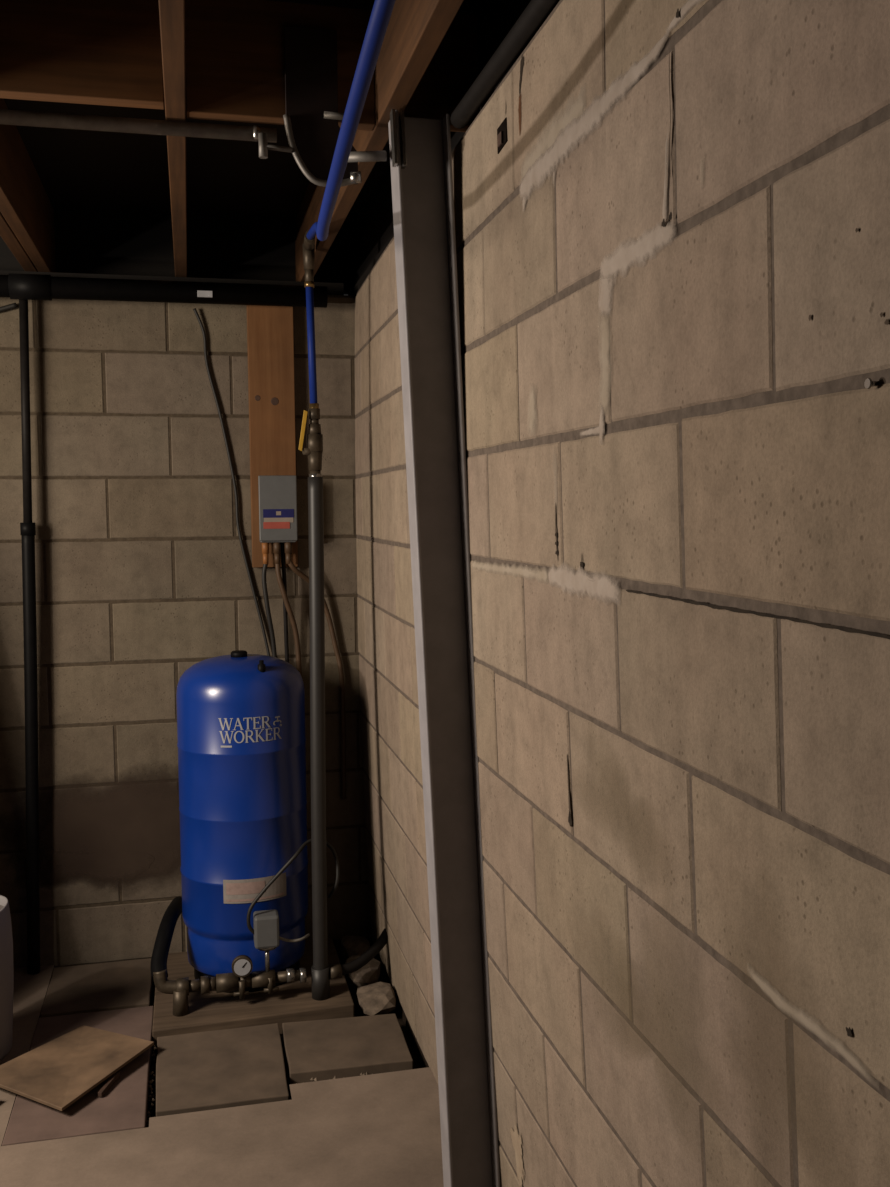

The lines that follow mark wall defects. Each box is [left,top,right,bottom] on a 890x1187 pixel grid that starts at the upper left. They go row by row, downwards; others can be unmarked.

water stain [581,315,610,441]